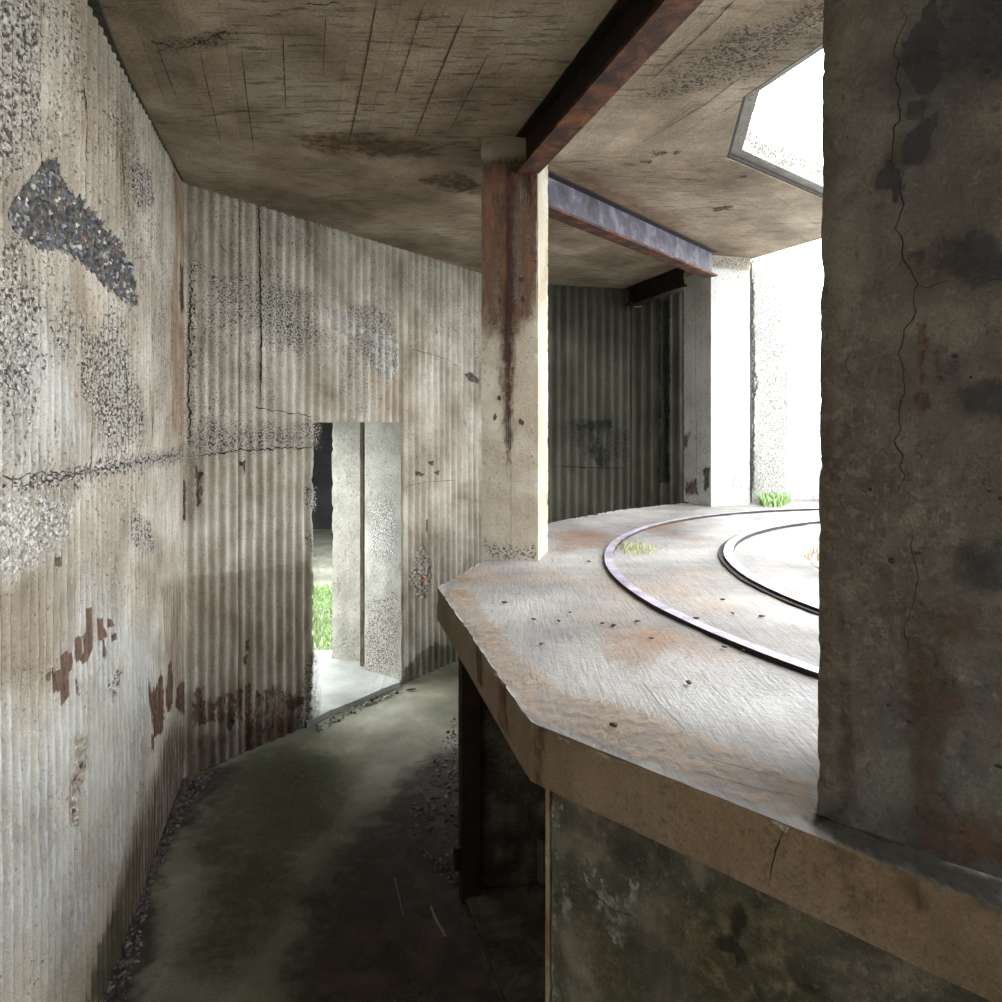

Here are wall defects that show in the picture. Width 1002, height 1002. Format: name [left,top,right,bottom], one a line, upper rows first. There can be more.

spalling [8,157,140,307]
rust [420,159,538,449]
crack [891,3,1001,663]
rust [46,606,117,705]
rust [148,661,299,751]
crack [767,829,786,888]